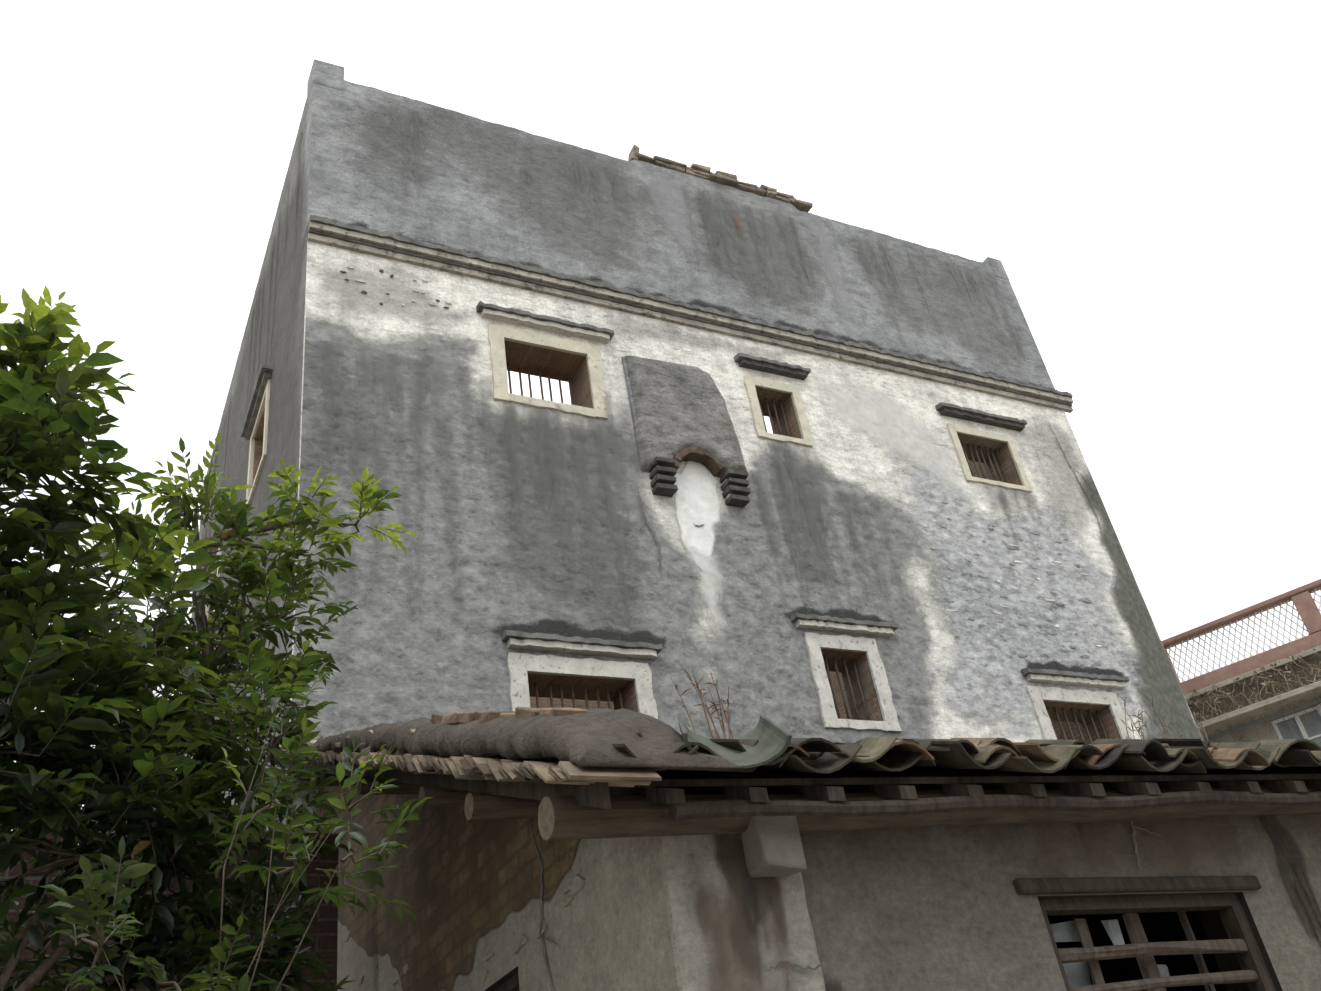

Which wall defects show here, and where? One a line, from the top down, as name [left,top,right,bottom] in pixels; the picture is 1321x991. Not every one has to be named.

damp [581,276,670,299]
damp [686,299,1041,386]
damp [832,390,960,486]
damp [292,317,933,743]
spalling [674,461,721,622]
damp [1027,661,1124,677]
spalling [318,786,586,991]
damp [1259,815,1321,943]